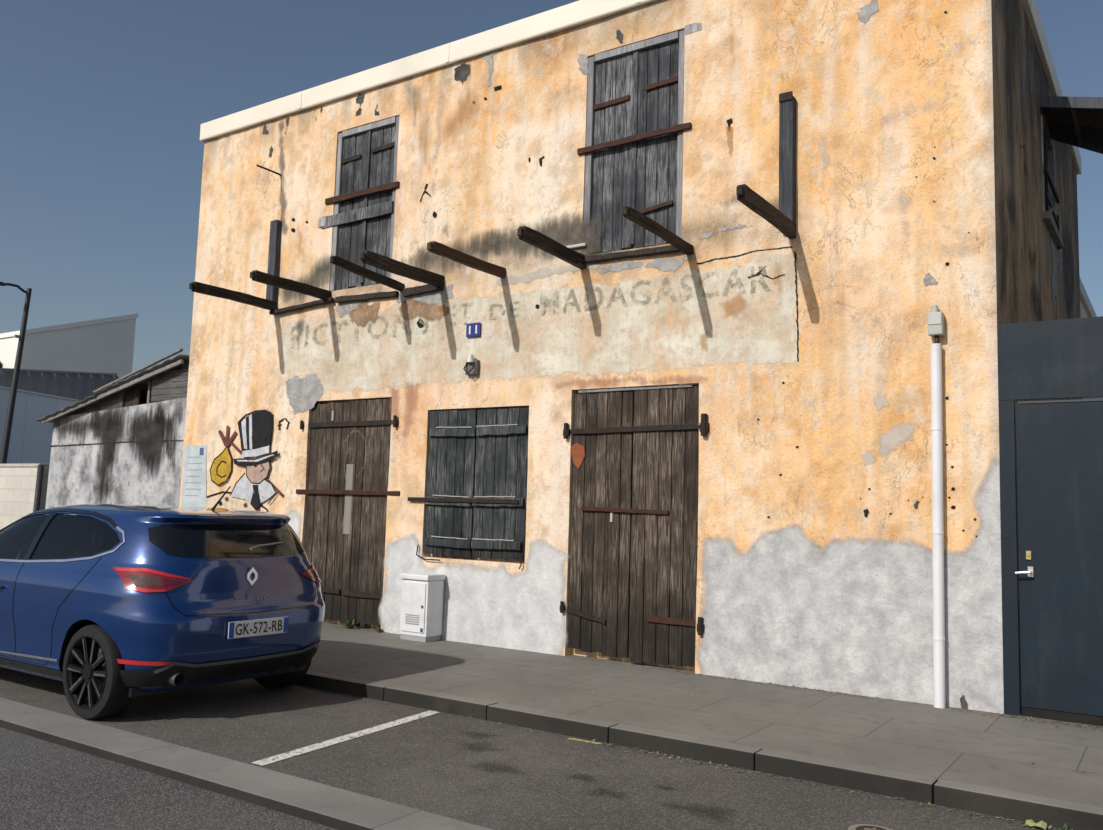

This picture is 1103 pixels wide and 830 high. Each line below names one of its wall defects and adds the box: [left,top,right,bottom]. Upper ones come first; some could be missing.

spalling [857,0,879,23]
damp [415,232,553,270]
damp [536,217,600,256]
damp [1001,193,1015,300]
damp [1064,227,1074,316]
spalling [335,301,380,327]
spalling [396,284,453,320]
spalling [286,374,323,415]
damp [52,407,182,500]